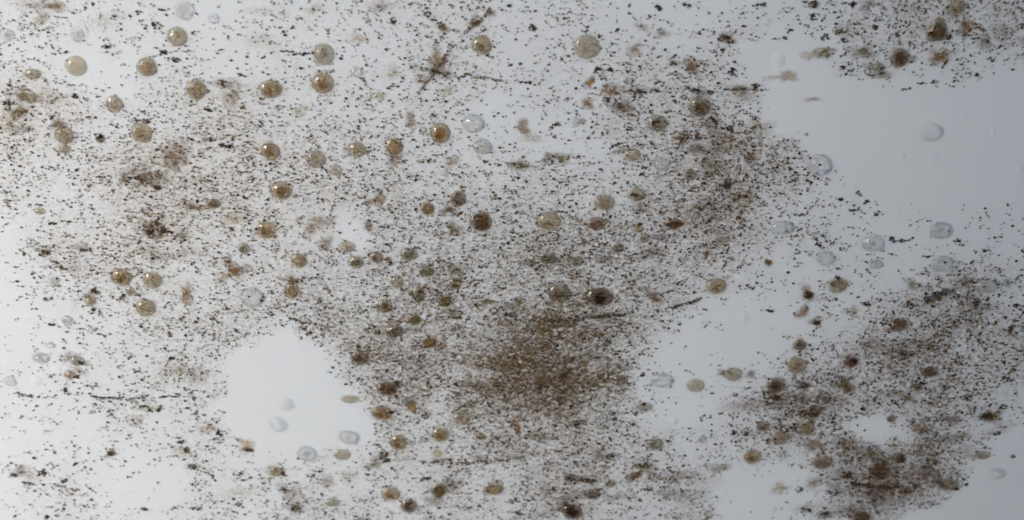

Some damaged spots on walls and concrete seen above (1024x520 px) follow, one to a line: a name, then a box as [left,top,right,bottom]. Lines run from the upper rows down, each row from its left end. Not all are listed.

mould [99,2,173,67]
mould [498,0,538,46]
mould [771,0,1024,91]
mould [0,436,112,520]
mould [162,478,252,520]